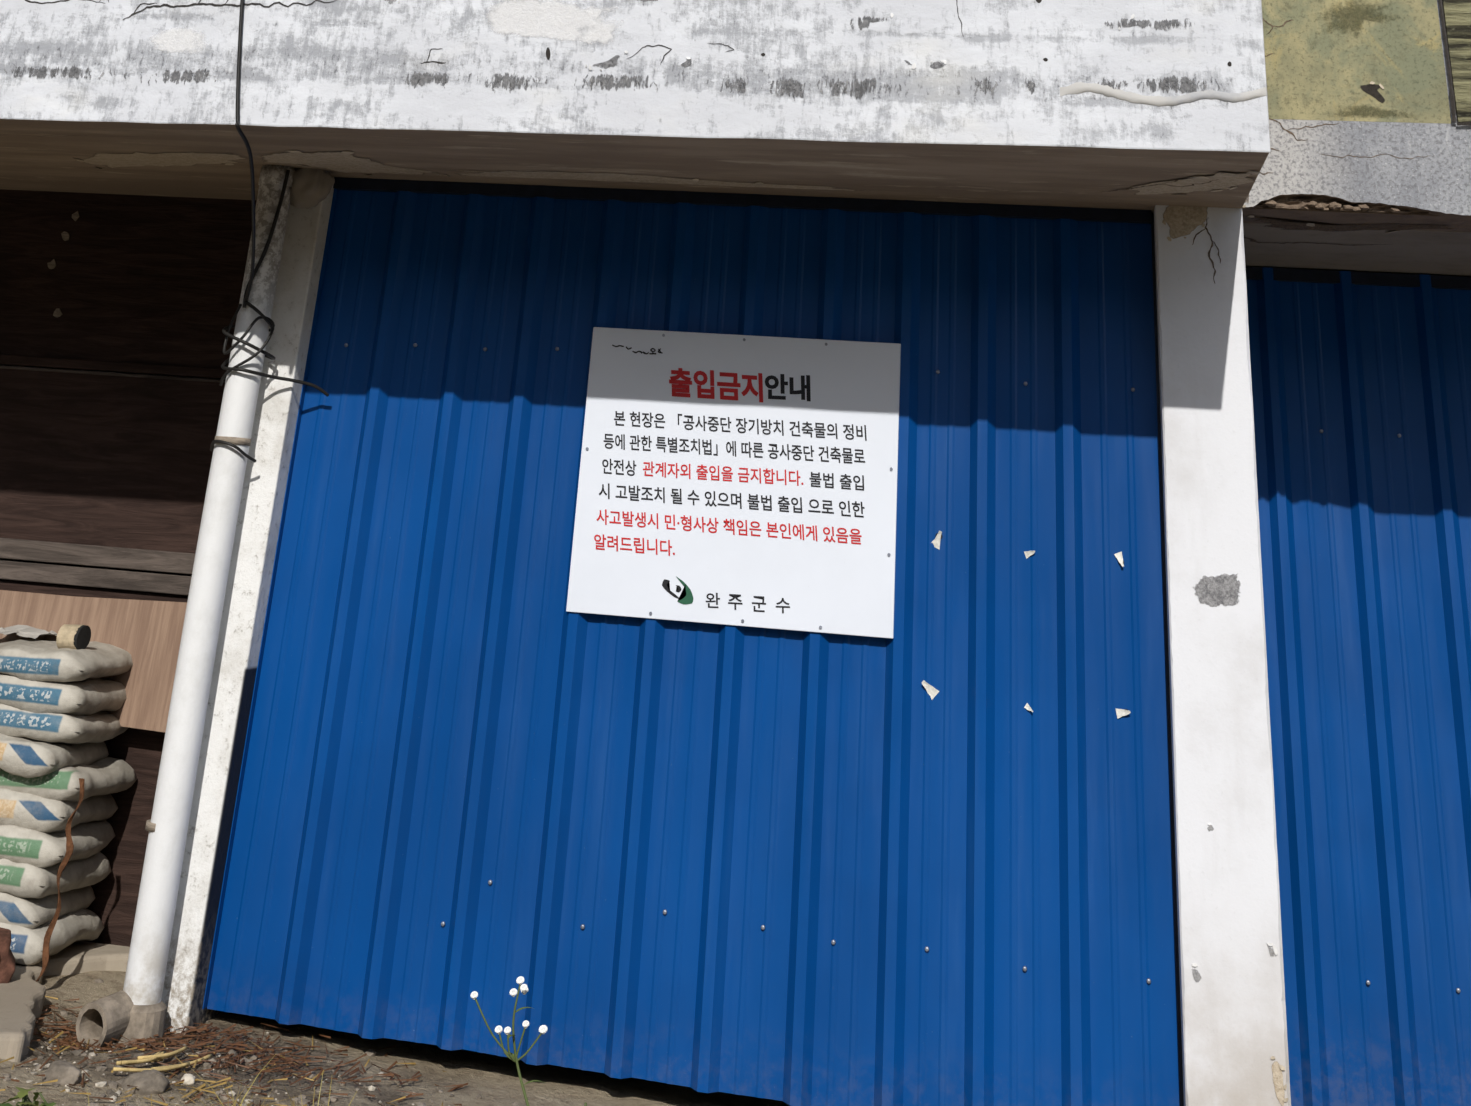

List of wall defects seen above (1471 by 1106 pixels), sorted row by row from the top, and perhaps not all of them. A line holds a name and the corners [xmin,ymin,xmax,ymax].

crack [25,0,336,20]
crack [1263,19,1292,57]
crack [1260,118,1431,175]
crack [1102,176,1393,283]
spalling [1129,171,1451,241]